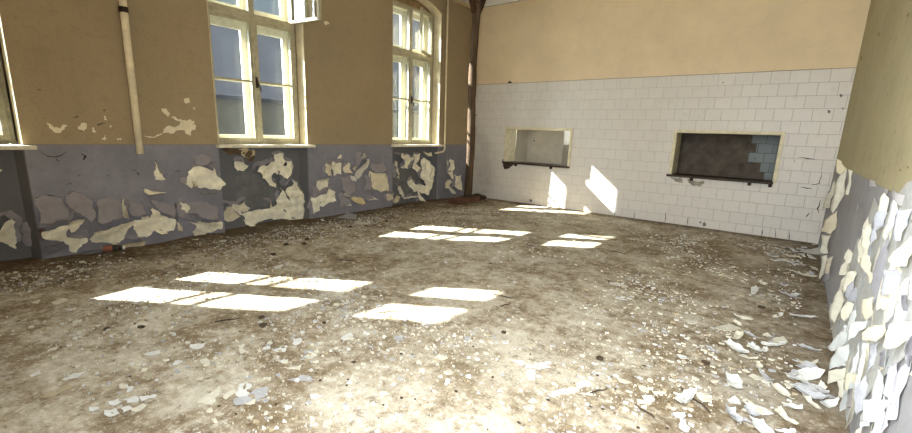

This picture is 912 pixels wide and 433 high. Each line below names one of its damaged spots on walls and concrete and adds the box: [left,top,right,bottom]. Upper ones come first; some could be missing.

peeling [145,98,196,138]
peeling [0,148,462,256]
flaking render [819,159,912,433]